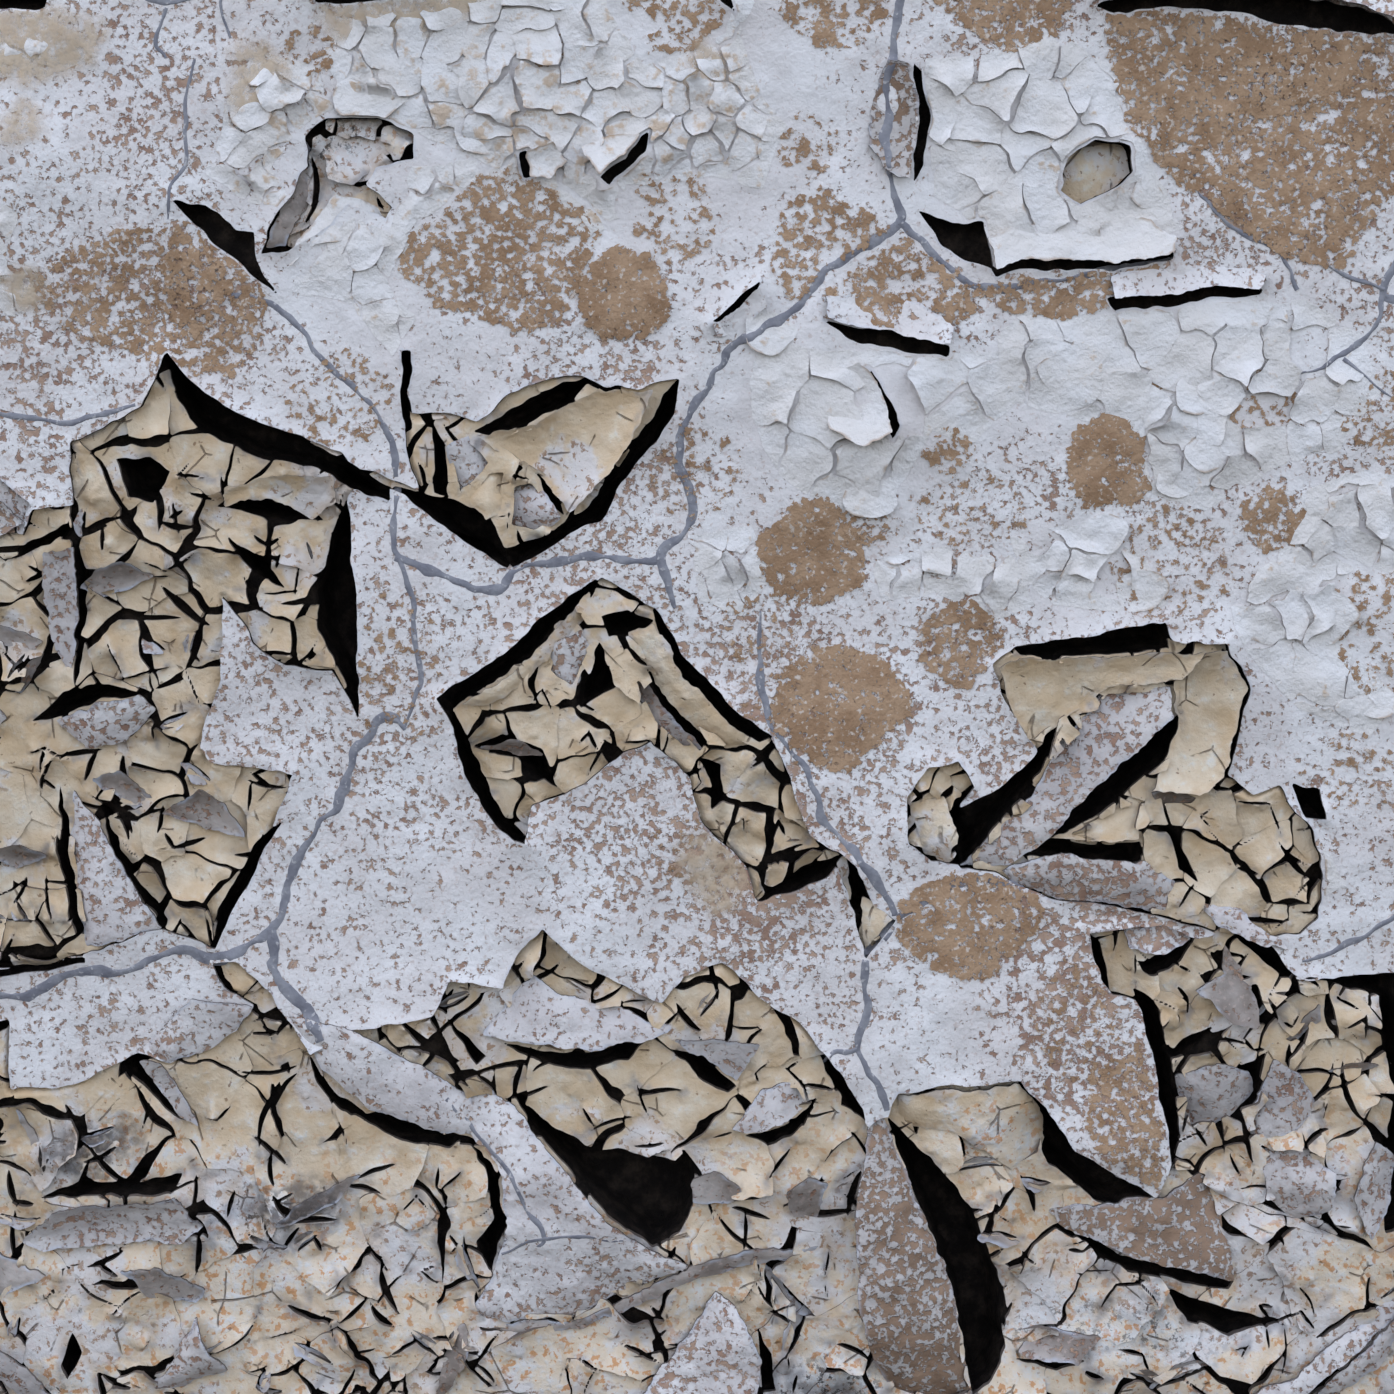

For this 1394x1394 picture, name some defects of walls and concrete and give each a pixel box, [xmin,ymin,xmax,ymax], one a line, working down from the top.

peeling [0,0,787,976]
crack [0,0,1173,1112]
peeling [0,469,1394,1394]
crack [1193,174,1299,291]
crack [1301,261,1394,397]
crack [1302,915,1394,962]